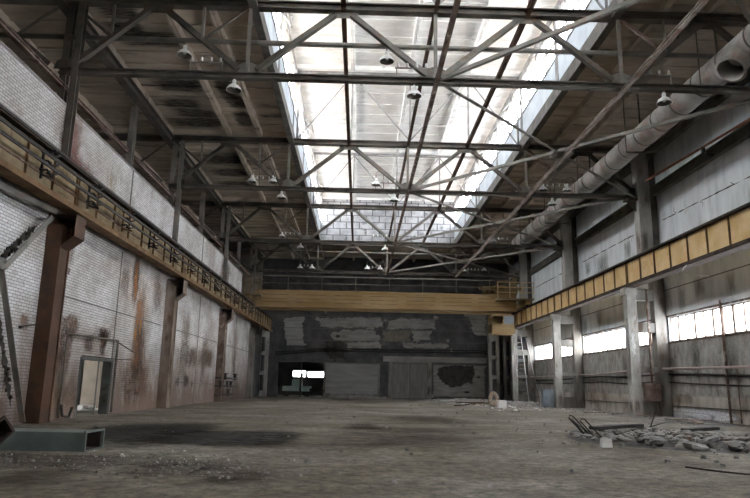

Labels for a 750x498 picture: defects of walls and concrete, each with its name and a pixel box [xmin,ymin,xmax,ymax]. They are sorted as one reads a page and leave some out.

leakage [154,79,222,127]
leakage [214,80,252,126]
rust [123,259,149,399]
flaking render [283,317,306,346]
flaking render [315,311,453,362]
flaking render [431,365,487,398]